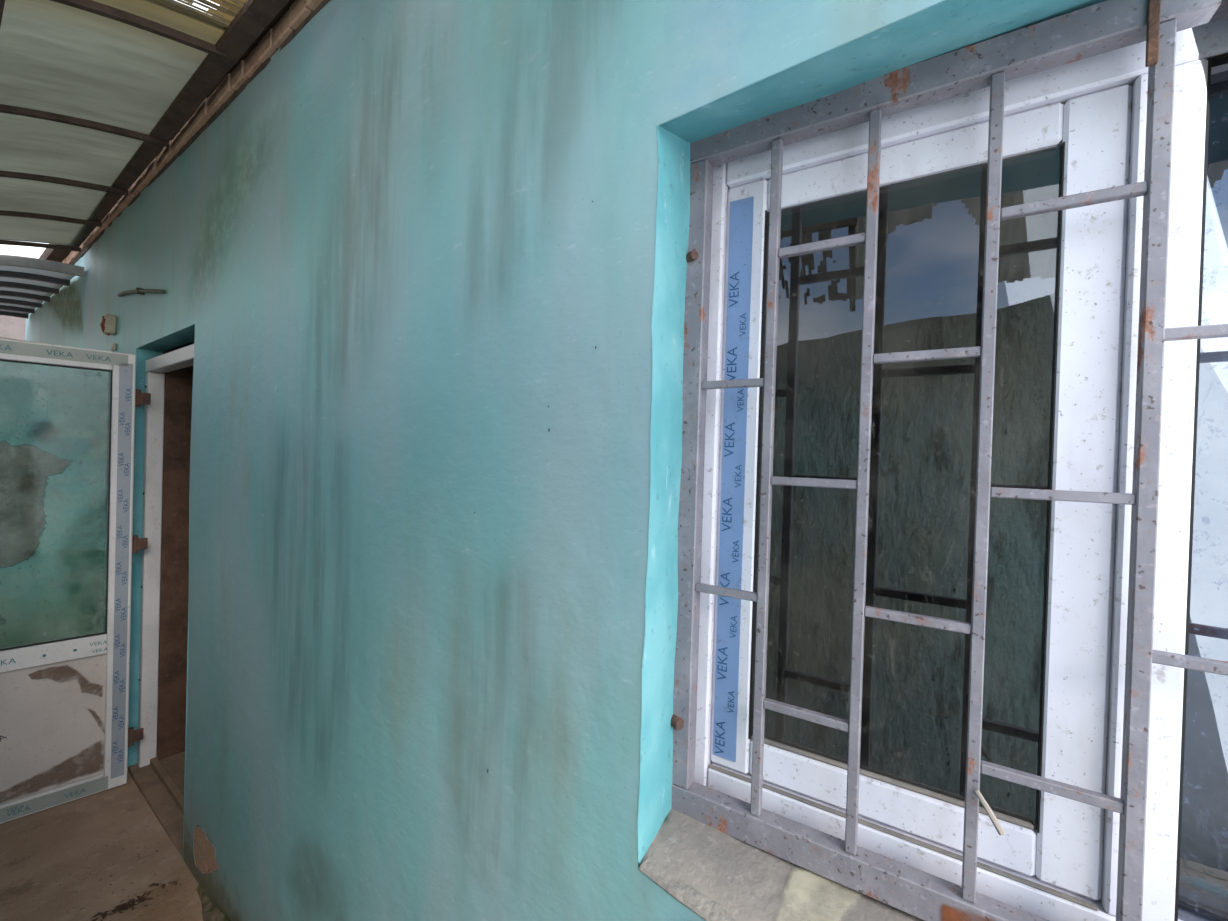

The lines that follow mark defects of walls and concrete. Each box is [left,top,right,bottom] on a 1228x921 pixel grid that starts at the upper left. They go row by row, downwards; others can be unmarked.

corrosion [941,905,991,921]